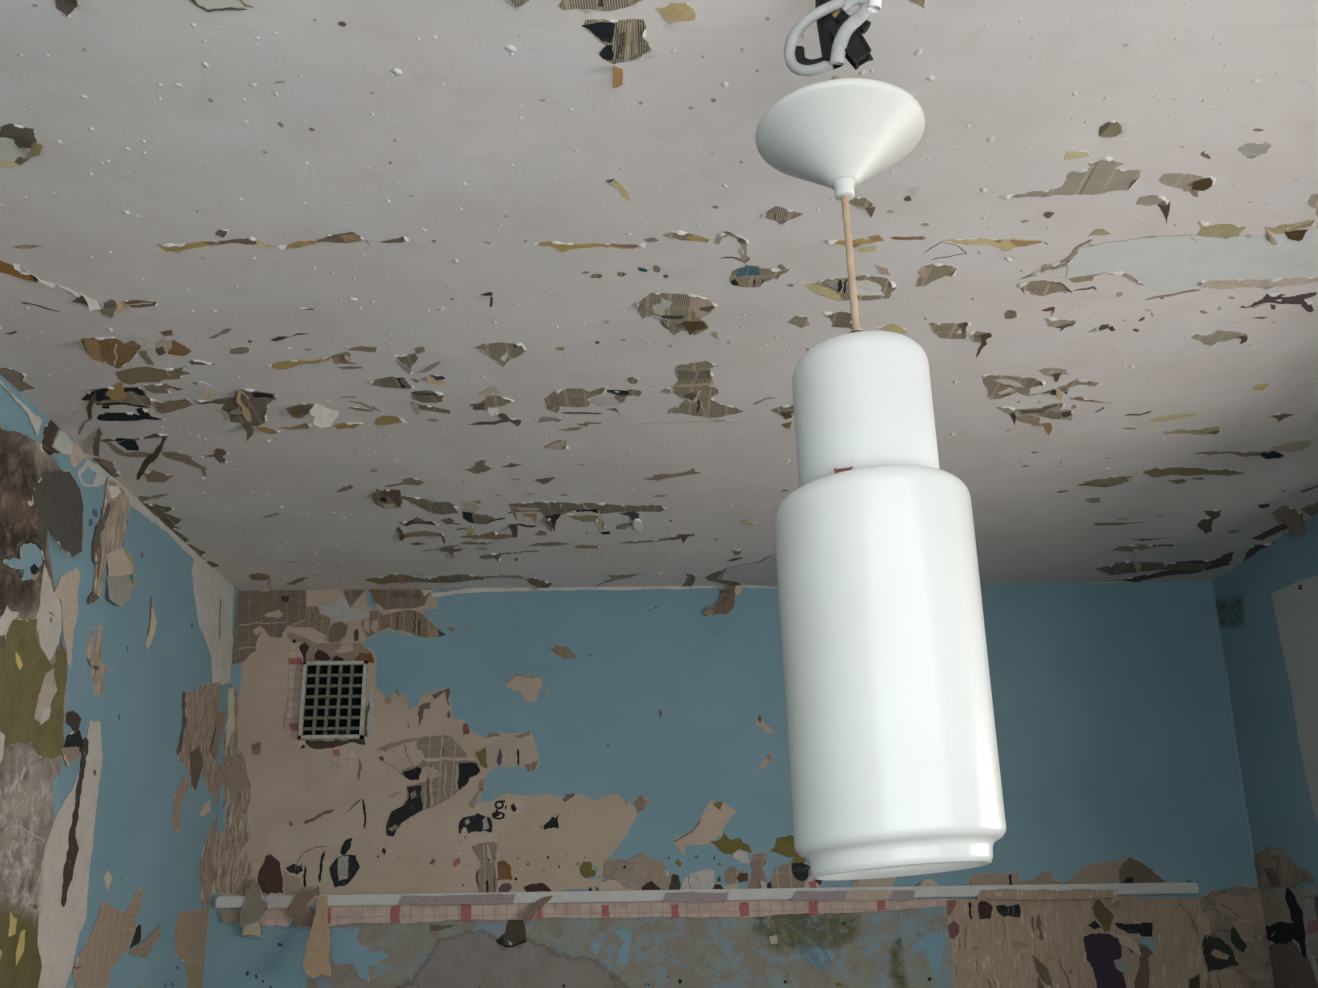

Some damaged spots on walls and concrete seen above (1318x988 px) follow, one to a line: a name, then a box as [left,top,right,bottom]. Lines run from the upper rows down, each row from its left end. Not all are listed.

peeling [558,0,696,88]
peeling [1238,127,1272,159]
peeling [0,245,79,297]
peeling [943,238,1048,255]
flaking render [998,150,1318,332]
peeling [208,328,252,354]
peeling [368,346,444,422]
peeling [474,342,526,367]
water stain [0,446,47,610]
peeling [0,366,697,988]
flaking render [305,857,1216,988]
peeling [1257,888,1316,988]